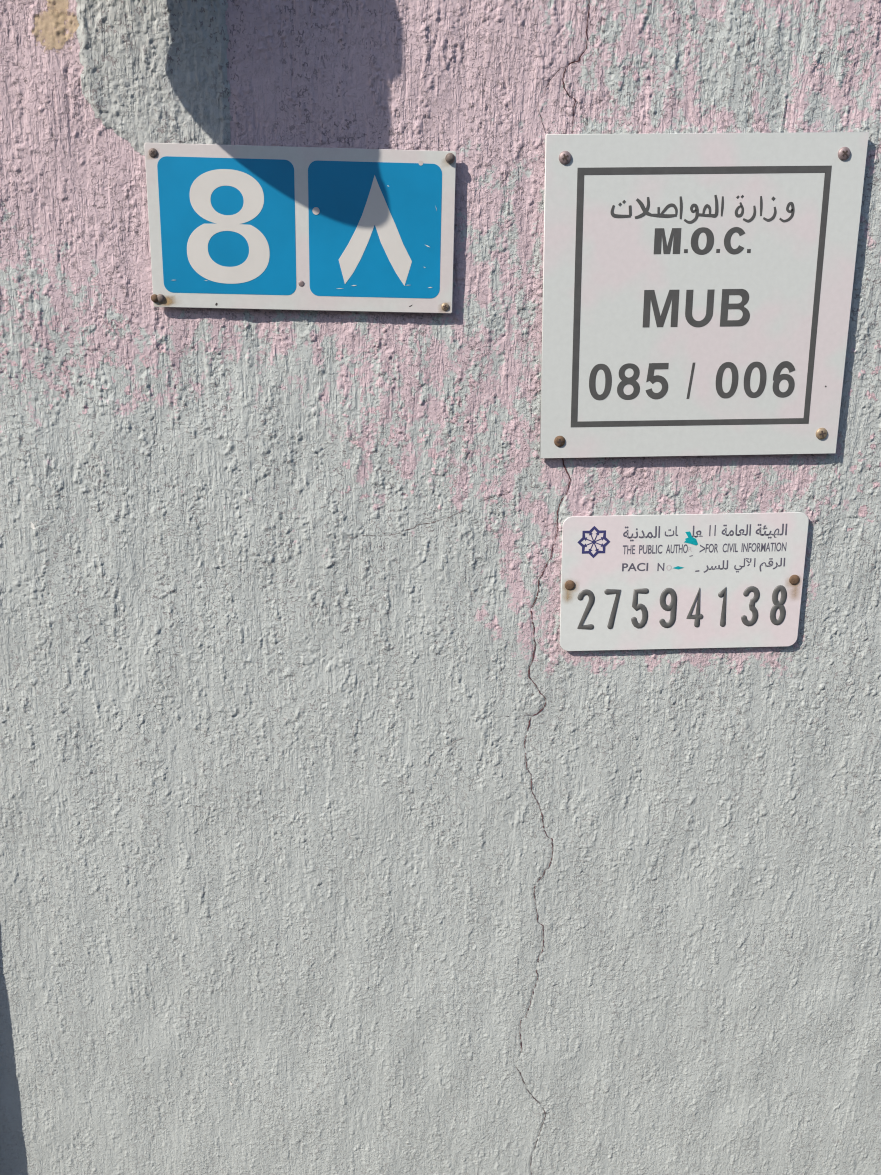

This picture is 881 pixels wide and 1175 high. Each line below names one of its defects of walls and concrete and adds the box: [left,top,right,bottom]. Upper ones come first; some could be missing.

crack [538,1,590,133]
crack [446,458,571,1175]